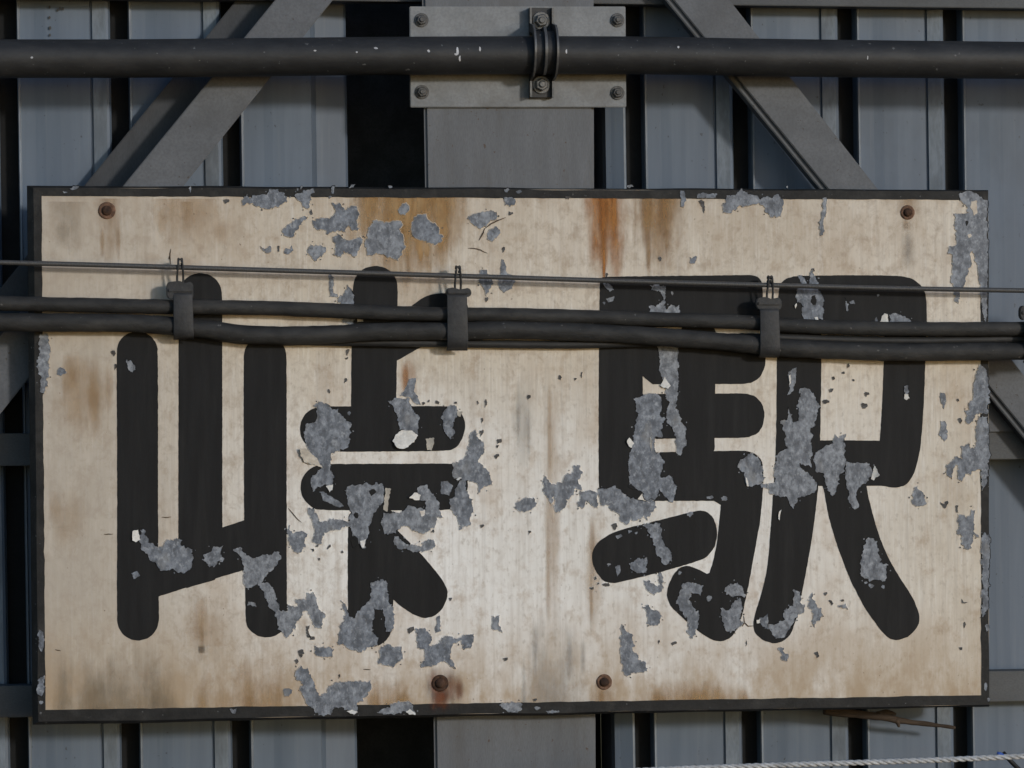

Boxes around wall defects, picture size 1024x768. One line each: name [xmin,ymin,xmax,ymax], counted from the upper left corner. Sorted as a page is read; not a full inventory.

peeling [223,185,444,262]
peeling [328,274,355,304]
corrosion [589,198,619,277]
peeling [947,190,989,322]
peeling [36,332,67,394]
peeling [387,378,462,451]
peeling [737,363,879,520]
peeling [938,364,992,490]
peeling [513,346,748,646]
peeling [132,389,503,717]
peeling [859,537,891,589]
peeling [757,589,848,662]